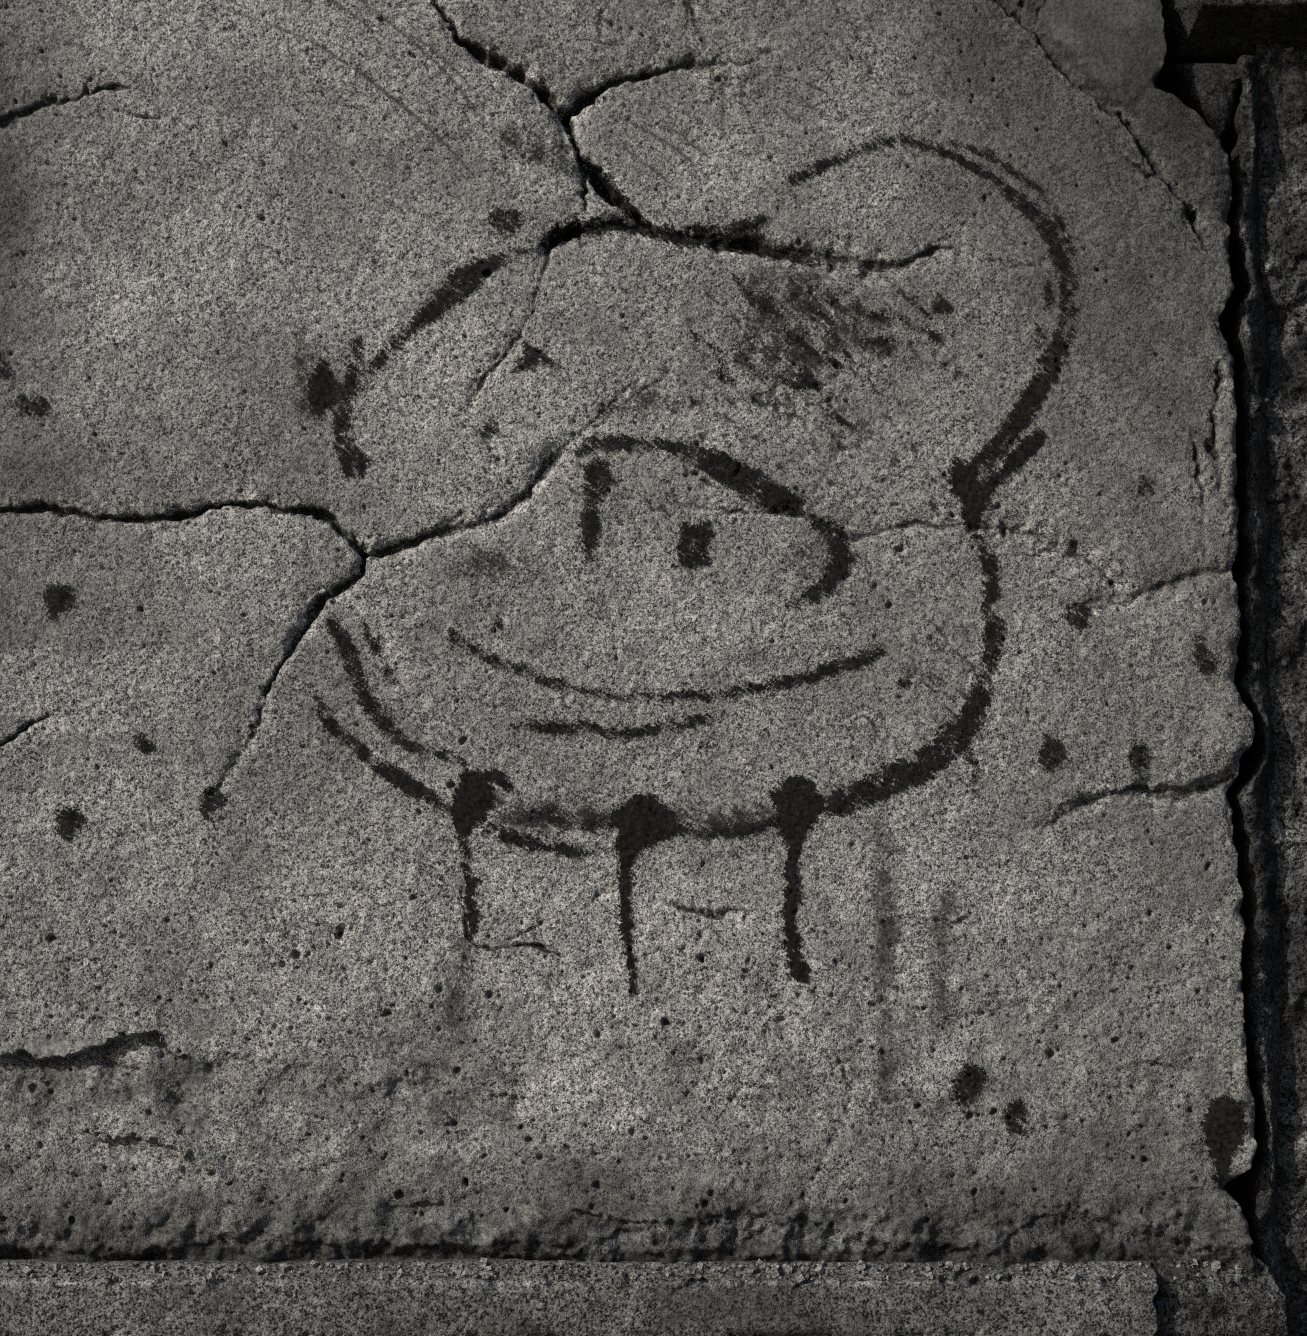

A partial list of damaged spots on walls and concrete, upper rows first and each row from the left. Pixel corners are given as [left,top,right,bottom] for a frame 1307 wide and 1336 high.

crack [0,0,1229,791]
crack [1041,774,1237,831]
spalling [0,1028,200,1122]